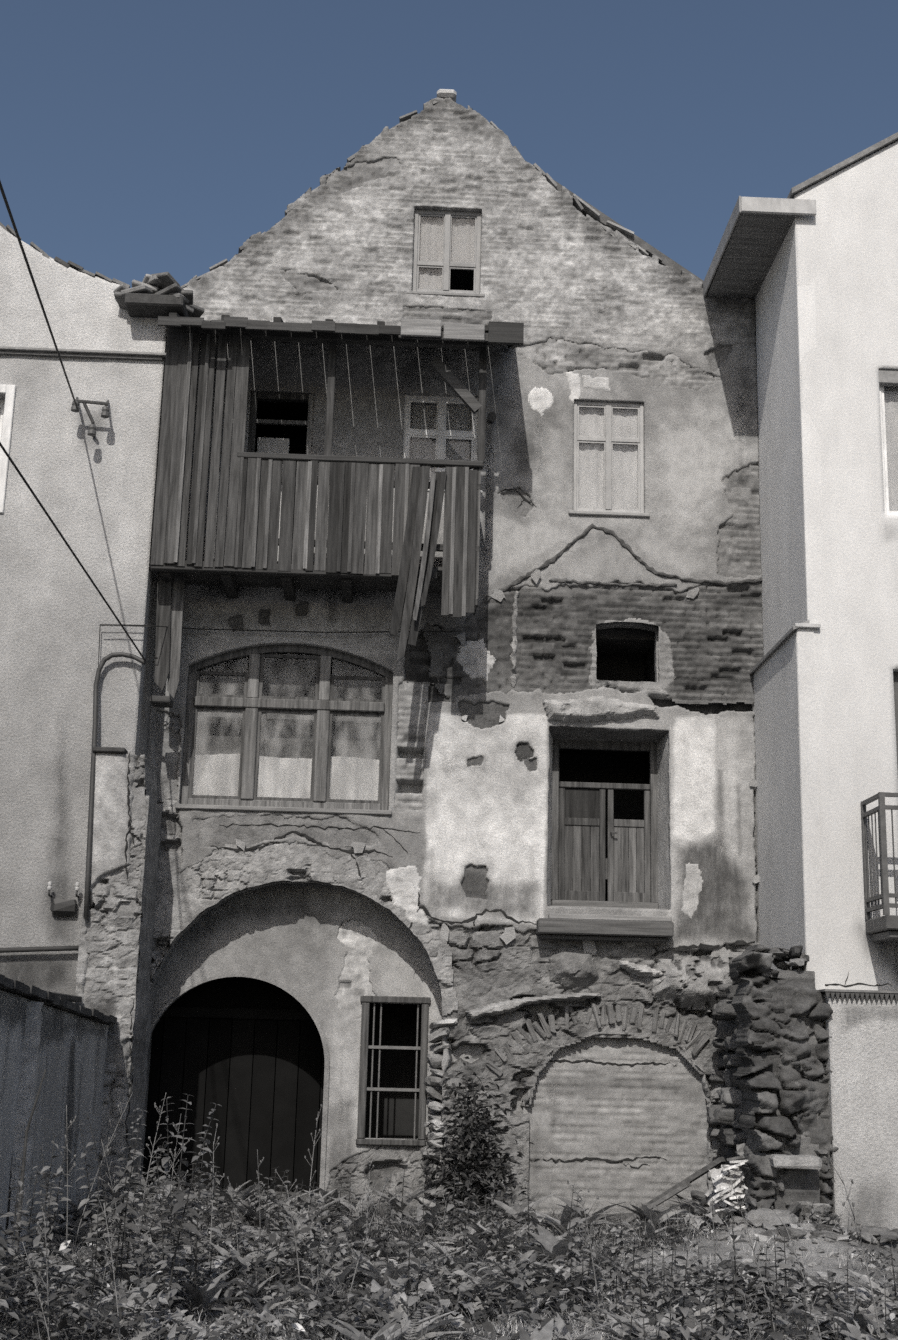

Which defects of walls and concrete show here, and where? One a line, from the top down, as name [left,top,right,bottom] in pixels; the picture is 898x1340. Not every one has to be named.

flaking render [500,338,732,391]
flaking render [394,464,763,812]
crack [215,823,421,877]
flaking render [82,711,760,1211]
crack [538,1059,678,1067]
crack [530,1156,666,1169]